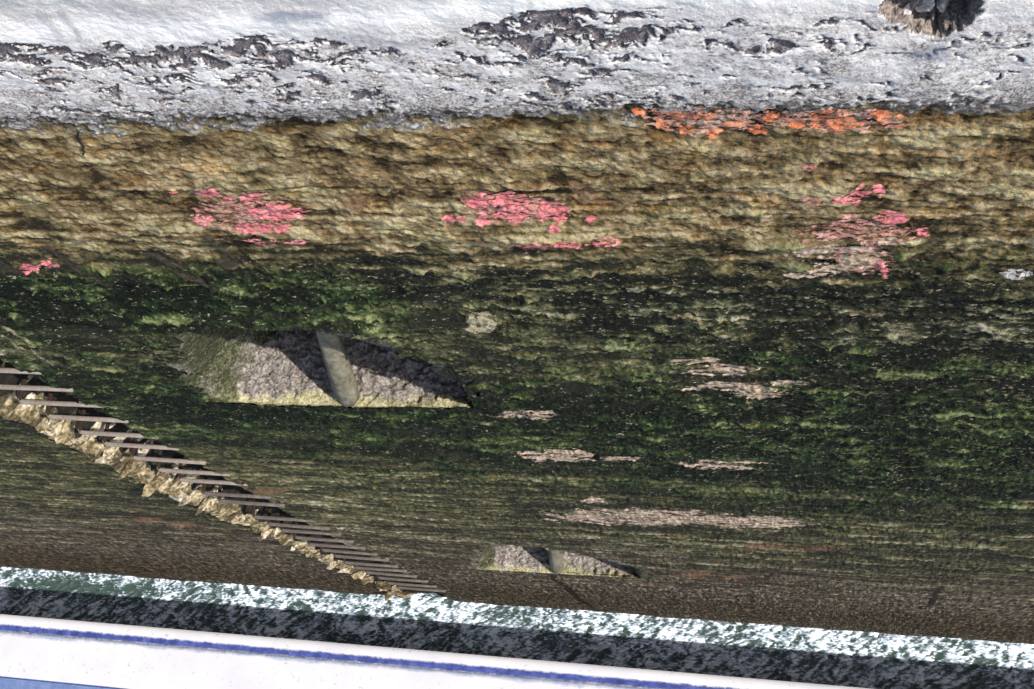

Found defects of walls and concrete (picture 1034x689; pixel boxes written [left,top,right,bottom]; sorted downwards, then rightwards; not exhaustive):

spalling [435,0,1001,113]
spalling [979,35,1030,86]
peeling [587,67,913,139]
leakage [1,326,54,365]
spalling [0,374,414,601]